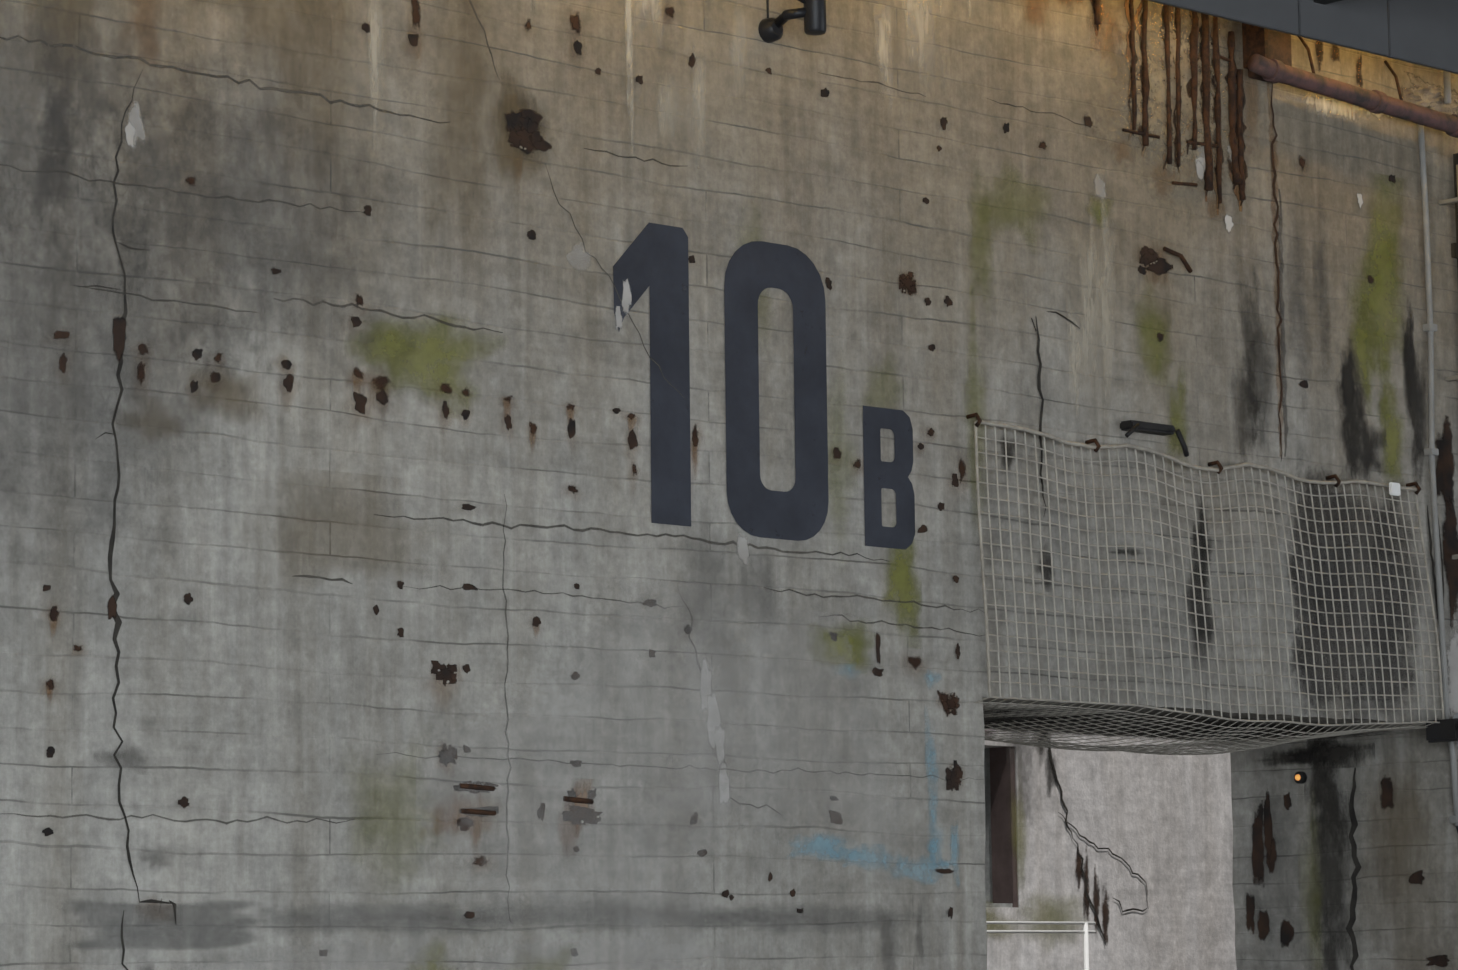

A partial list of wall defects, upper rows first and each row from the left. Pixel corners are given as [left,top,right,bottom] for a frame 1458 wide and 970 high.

spalling [1090,0,1102,36]
spalling [498,93,552,167]
spalling [1110,0,1248,233]
rust [353,367,389,414]
crack [1031,311,1080,515]
damp [1341,313,1425,476]
crack [83,70,176,970]
damp [1187,504,1213,650]
crack [1043,733,1148,945]